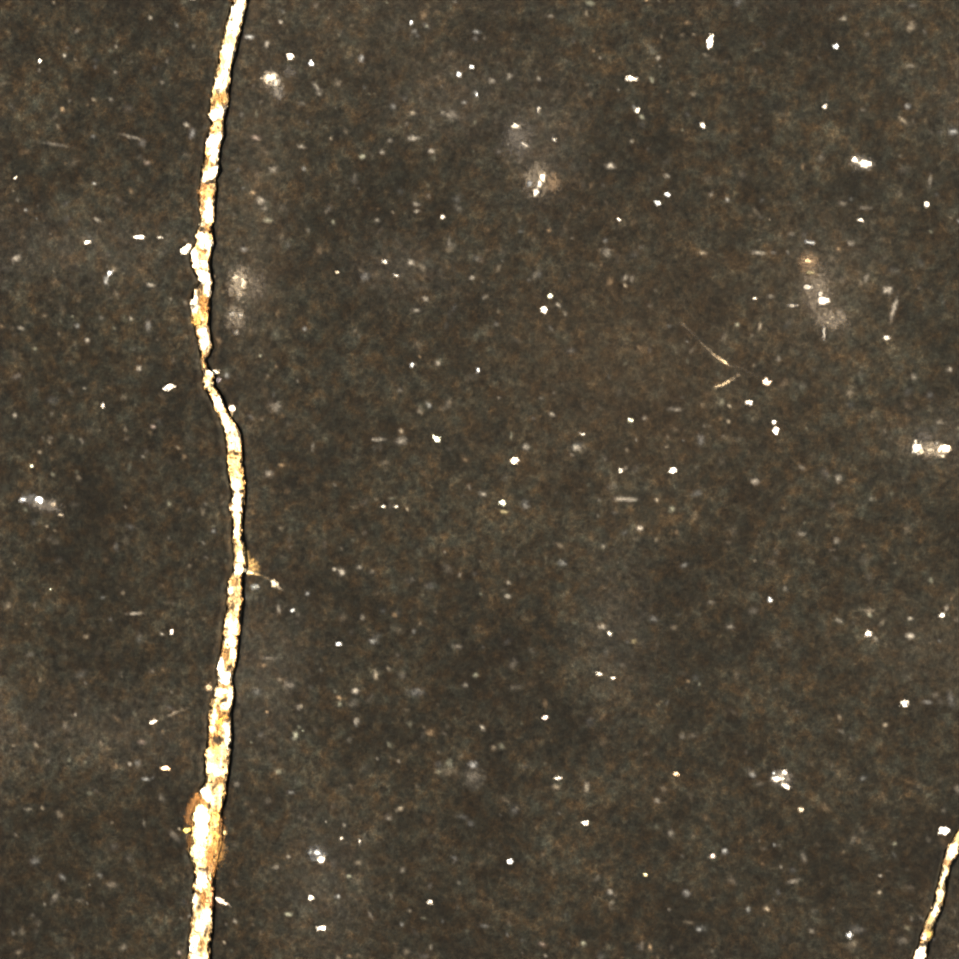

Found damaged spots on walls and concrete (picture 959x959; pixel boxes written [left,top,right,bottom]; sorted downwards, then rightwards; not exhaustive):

crack [181,0,281,959]
crack [914,832,959,959]